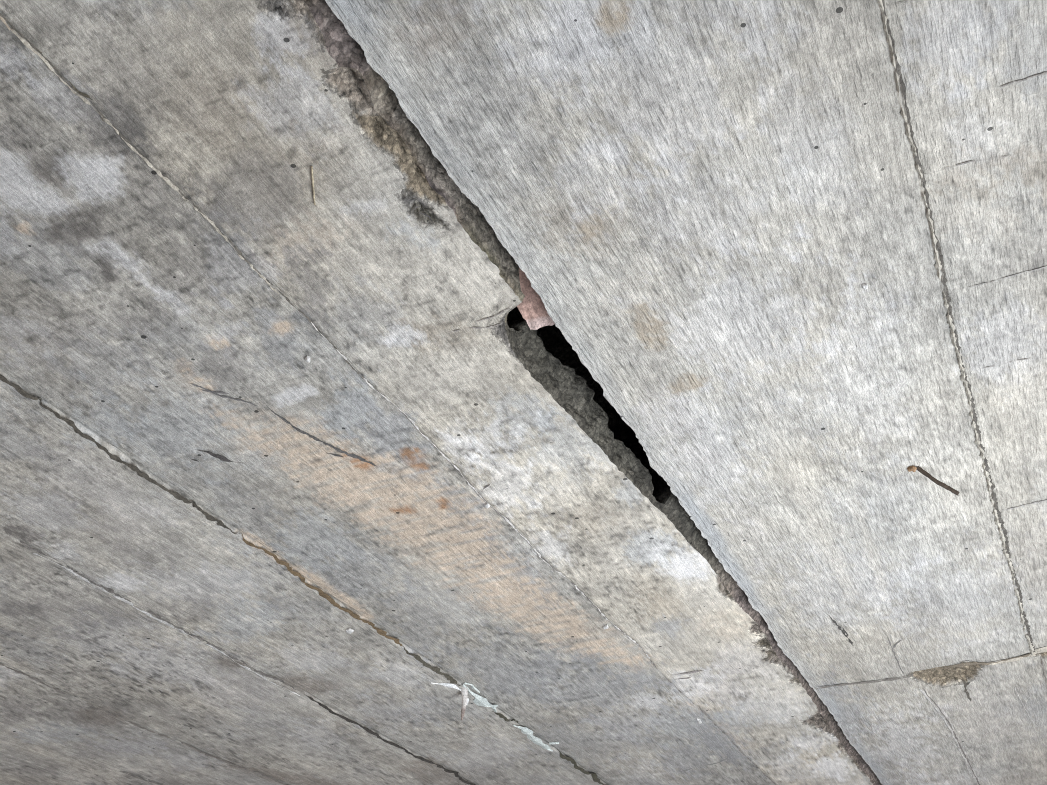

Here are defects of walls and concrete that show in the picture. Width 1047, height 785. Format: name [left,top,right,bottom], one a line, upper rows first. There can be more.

crack [0,13,144,157]
crack [0,374,460,686]
crack [0,531,476,785]
crack [162,175,776,785]
crack [821,0,1047,785]